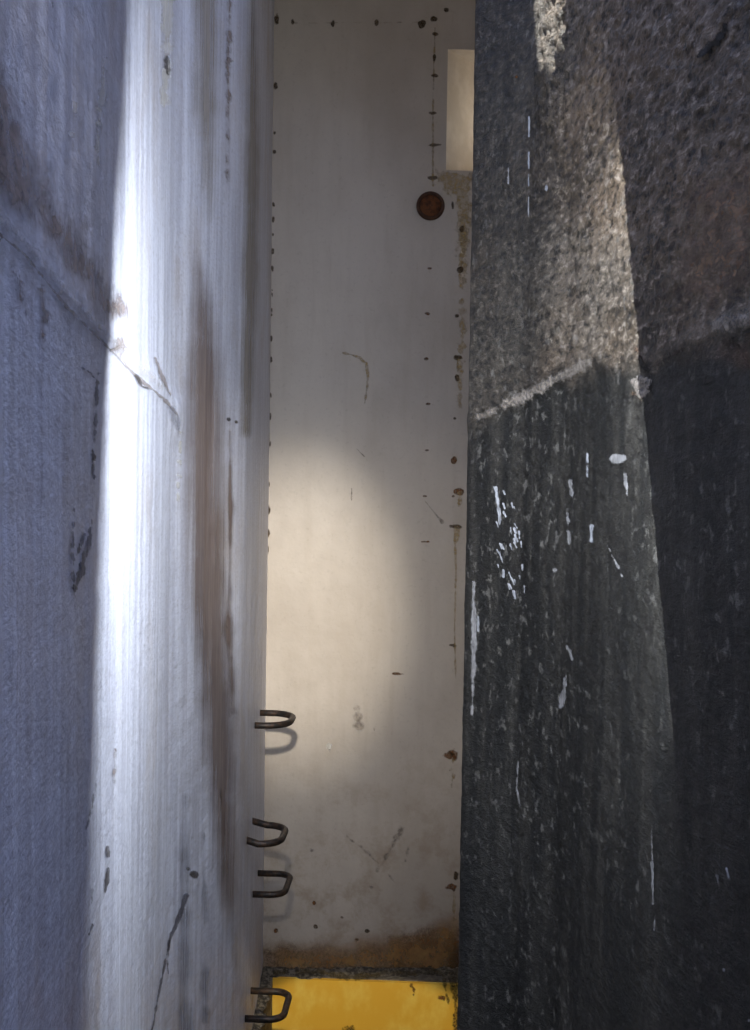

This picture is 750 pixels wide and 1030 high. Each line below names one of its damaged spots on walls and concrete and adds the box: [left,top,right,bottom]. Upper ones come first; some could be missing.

corrosion [418,8,449,36]
water stain [190,294,234,901]
crack [151,893,189,1030]
corrosion [263,925,459,969]